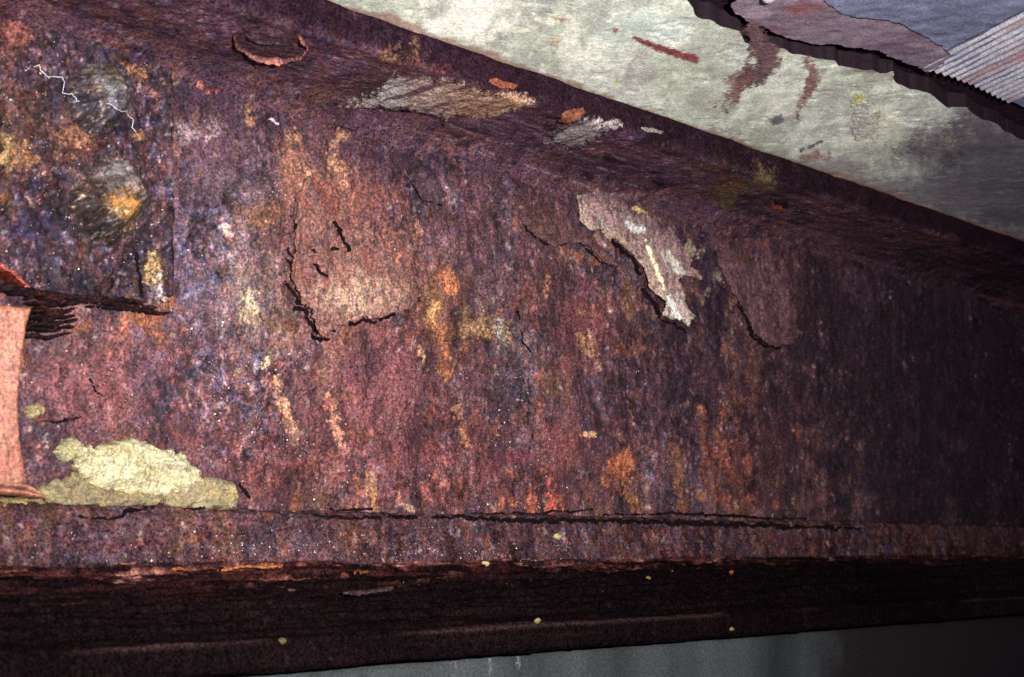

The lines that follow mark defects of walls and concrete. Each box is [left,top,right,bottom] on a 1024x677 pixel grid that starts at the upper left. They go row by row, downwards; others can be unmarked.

peeling [337,71,535,124]
peeling [543,116,623,149]
corrosion [632,36,699,63]
corrosion [705,20,783,114]
corrosion [0,264,178,352]
crack [285,218,396,343]
corrosion [251,127,512,393]
crack [517,310,532,352]
corrosion [501,188,702,326]
crack [524,225,687,334]
corrosion [709,232,803,347]
crack [736,304,788,350]